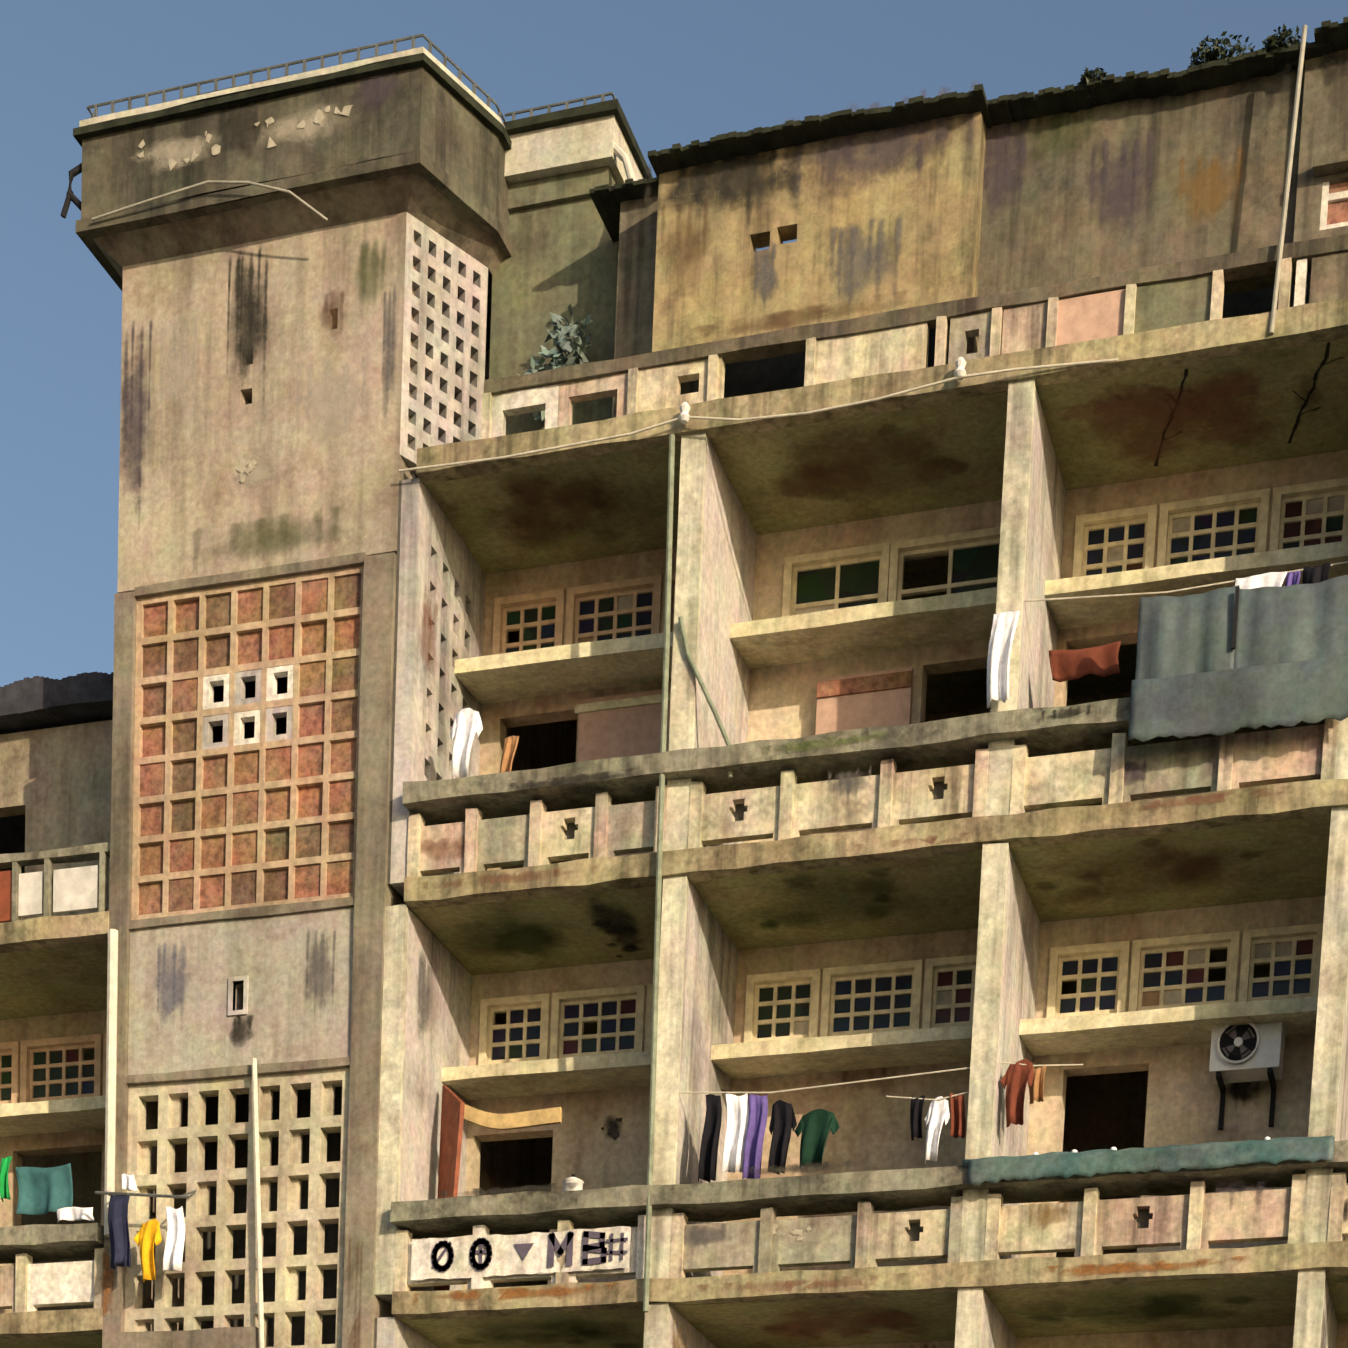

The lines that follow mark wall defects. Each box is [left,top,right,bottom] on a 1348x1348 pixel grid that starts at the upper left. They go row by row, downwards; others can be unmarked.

peeling [137,131,221,171]
peeling [254,105,354,149]
damp [755,245,776,296]
damp [831,218,901,294]
damp [228,250,268,372]
damp [123,317,197,486]
crack [1154,369,1188,467]
crack [1288,342,1345,443]
damp [158,945,184,1013]
damp [307,933,336,1001]
corrosion [1048,1259,1209,1275]